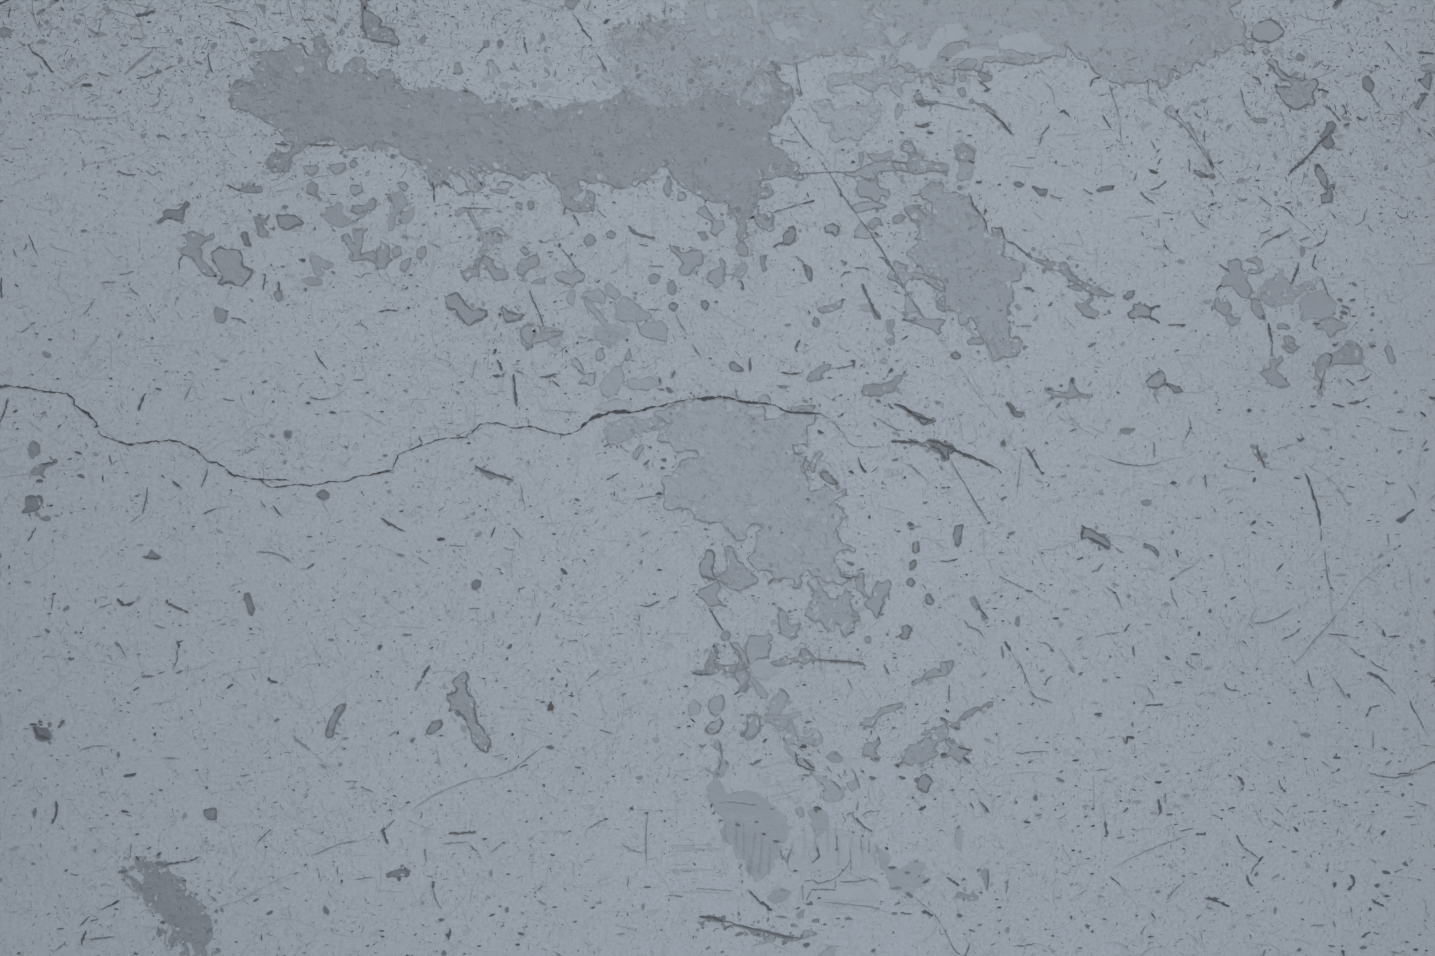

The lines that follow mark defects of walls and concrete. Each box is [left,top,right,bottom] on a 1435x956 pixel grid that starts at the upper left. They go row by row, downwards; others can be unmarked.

peeling [230,35,807,349]
peeling [812,298,844,327]
peeling [729,361,744,372]
peeling [1146,370,1183,393]
crack [0,385,883,488]
peeling [470,457,514,480]
peeling [316,489,330,501]
peeling [1081,527,1111,549]
peeling [244,592,255,616]
peeling [325,703,348,740]
peeling [410,671,491,753]
peeling [183,807,217,820]